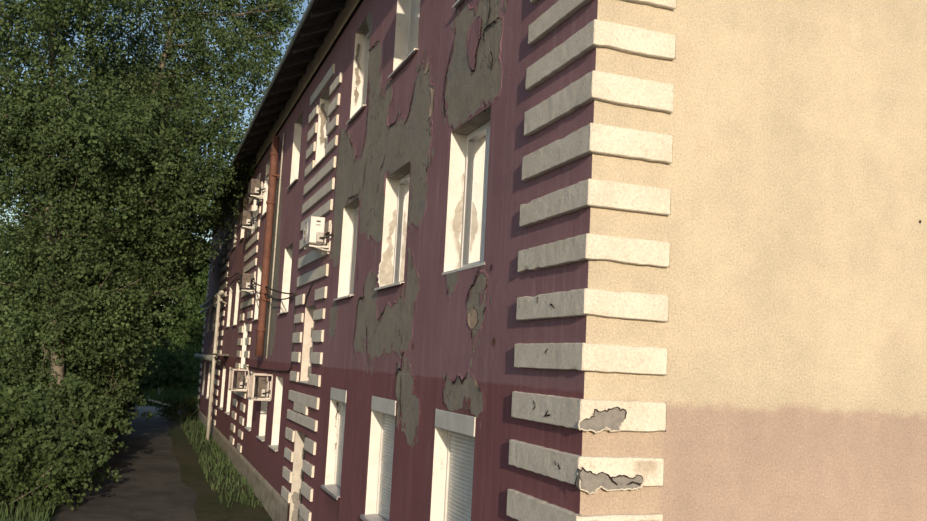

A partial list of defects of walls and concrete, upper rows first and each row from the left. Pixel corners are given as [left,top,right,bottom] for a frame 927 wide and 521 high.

peeling [329,0,507,449]
spalling [578,406,627,433]
spalling [574,466,644,494]